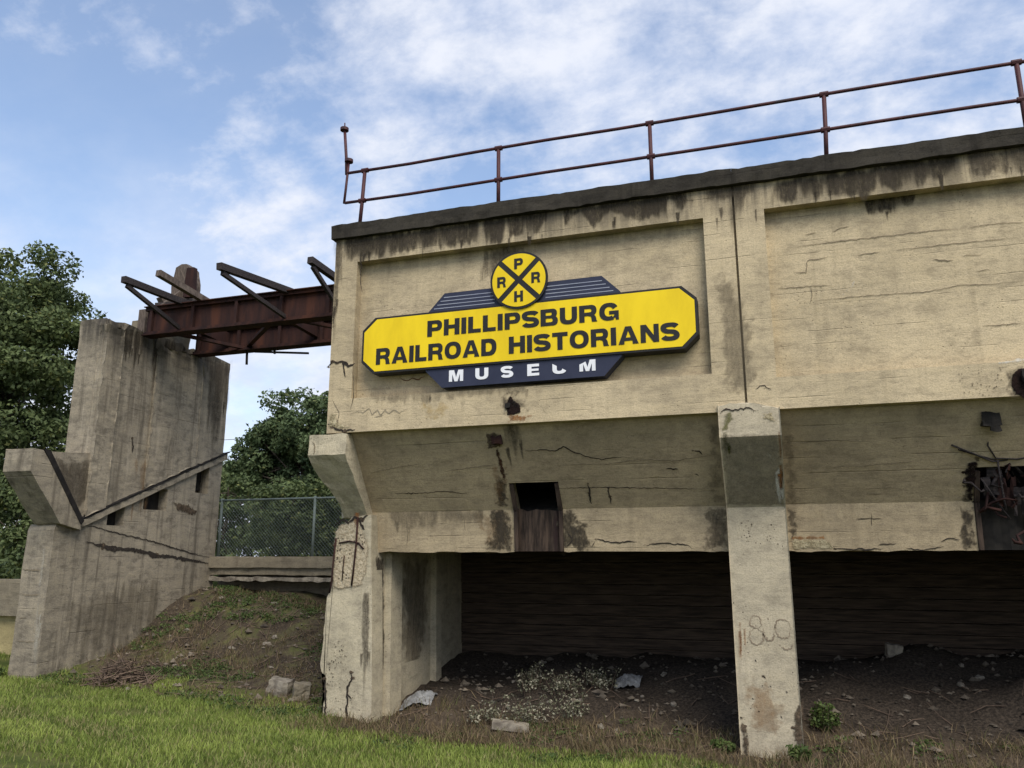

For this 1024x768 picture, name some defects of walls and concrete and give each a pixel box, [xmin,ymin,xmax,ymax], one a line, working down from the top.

water stain [775,156,954,215]
crack [312,360,402,454]
crack [721,385,771,412]
crack [373,464,496,494]
crack [531,446,707,504]
spalling [961,457,979,503]
spalling [175,503,197,515]
crack [87,525,210,564]
spalling [329,517,368,593]
crack [567,534,690,547]
crack [322,671,355,716]